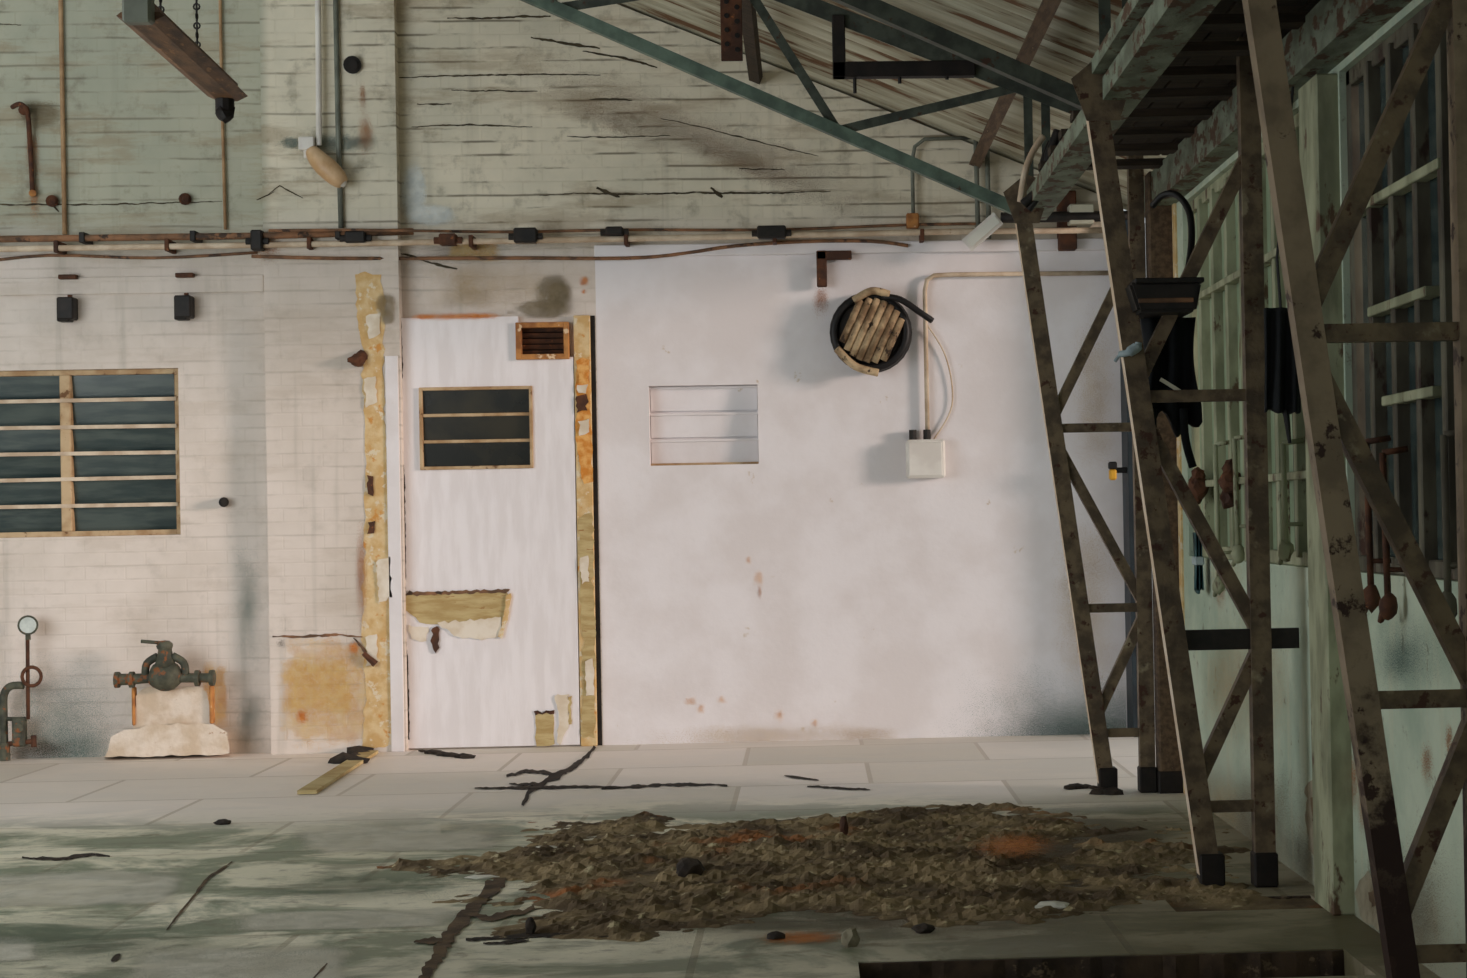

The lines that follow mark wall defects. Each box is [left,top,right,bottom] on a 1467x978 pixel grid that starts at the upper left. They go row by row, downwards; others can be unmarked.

damp [518,50,916,239]
flaking render [355,271,512,748]
crack [475,745,727,848]
crack [784,775,870,790]
crack [414,878,609,978]